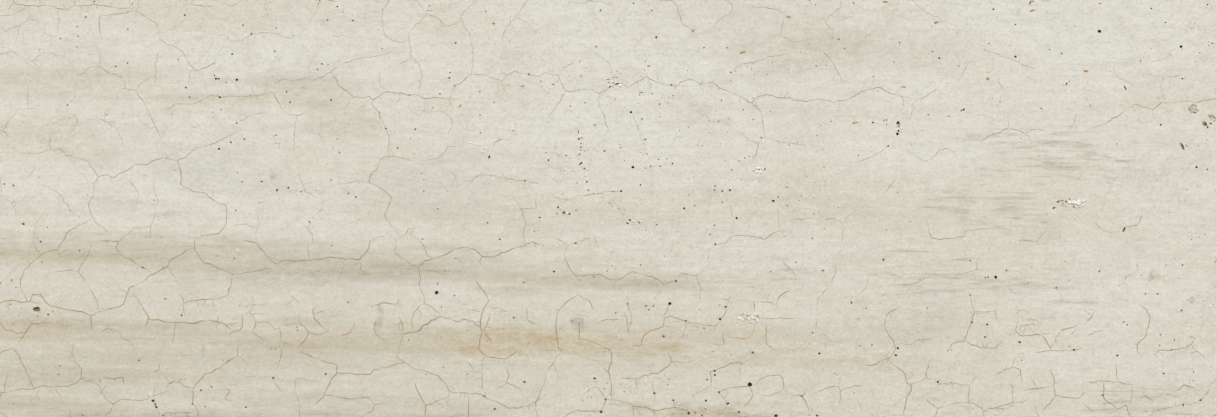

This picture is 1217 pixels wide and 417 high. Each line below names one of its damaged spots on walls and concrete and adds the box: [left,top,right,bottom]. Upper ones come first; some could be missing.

crack [0,130,1154,417]